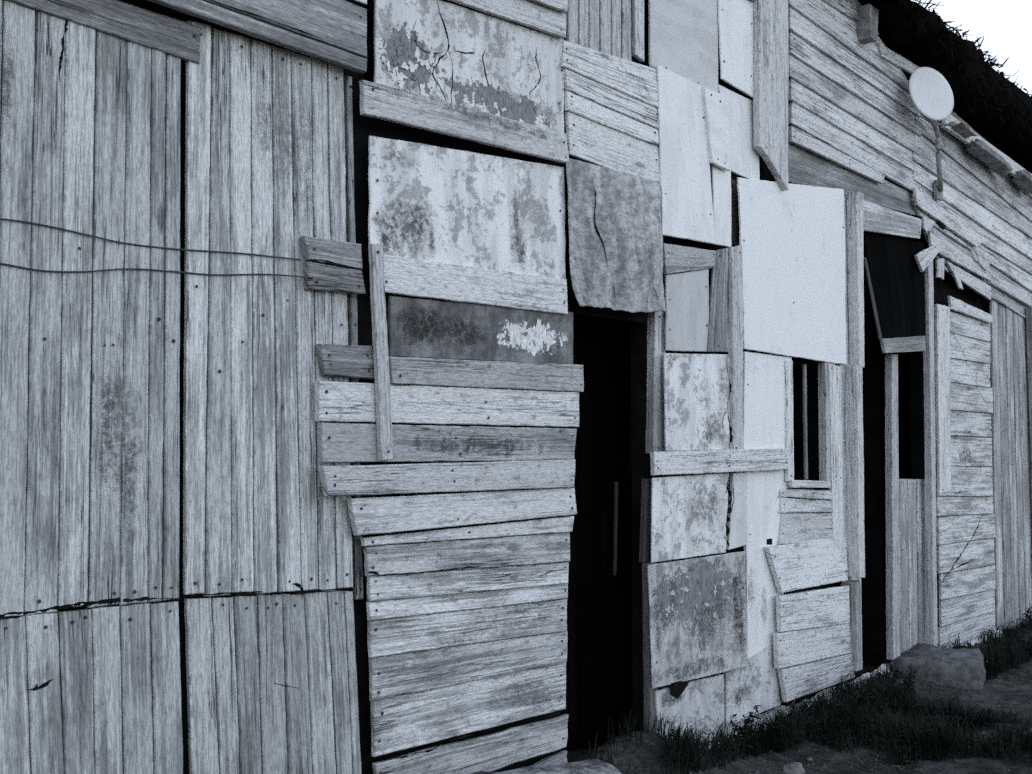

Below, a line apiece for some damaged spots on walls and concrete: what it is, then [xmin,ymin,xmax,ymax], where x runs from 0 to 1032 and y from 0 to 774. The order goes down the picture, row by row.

crack [413,3,490,104]
peeling [375,22,554,130]
crack [530,50,541,116]
peeling [497,319,568,356]
crack [942,518,981,582]
crack [0,564,504,619]
peeling [649,551,742,634]